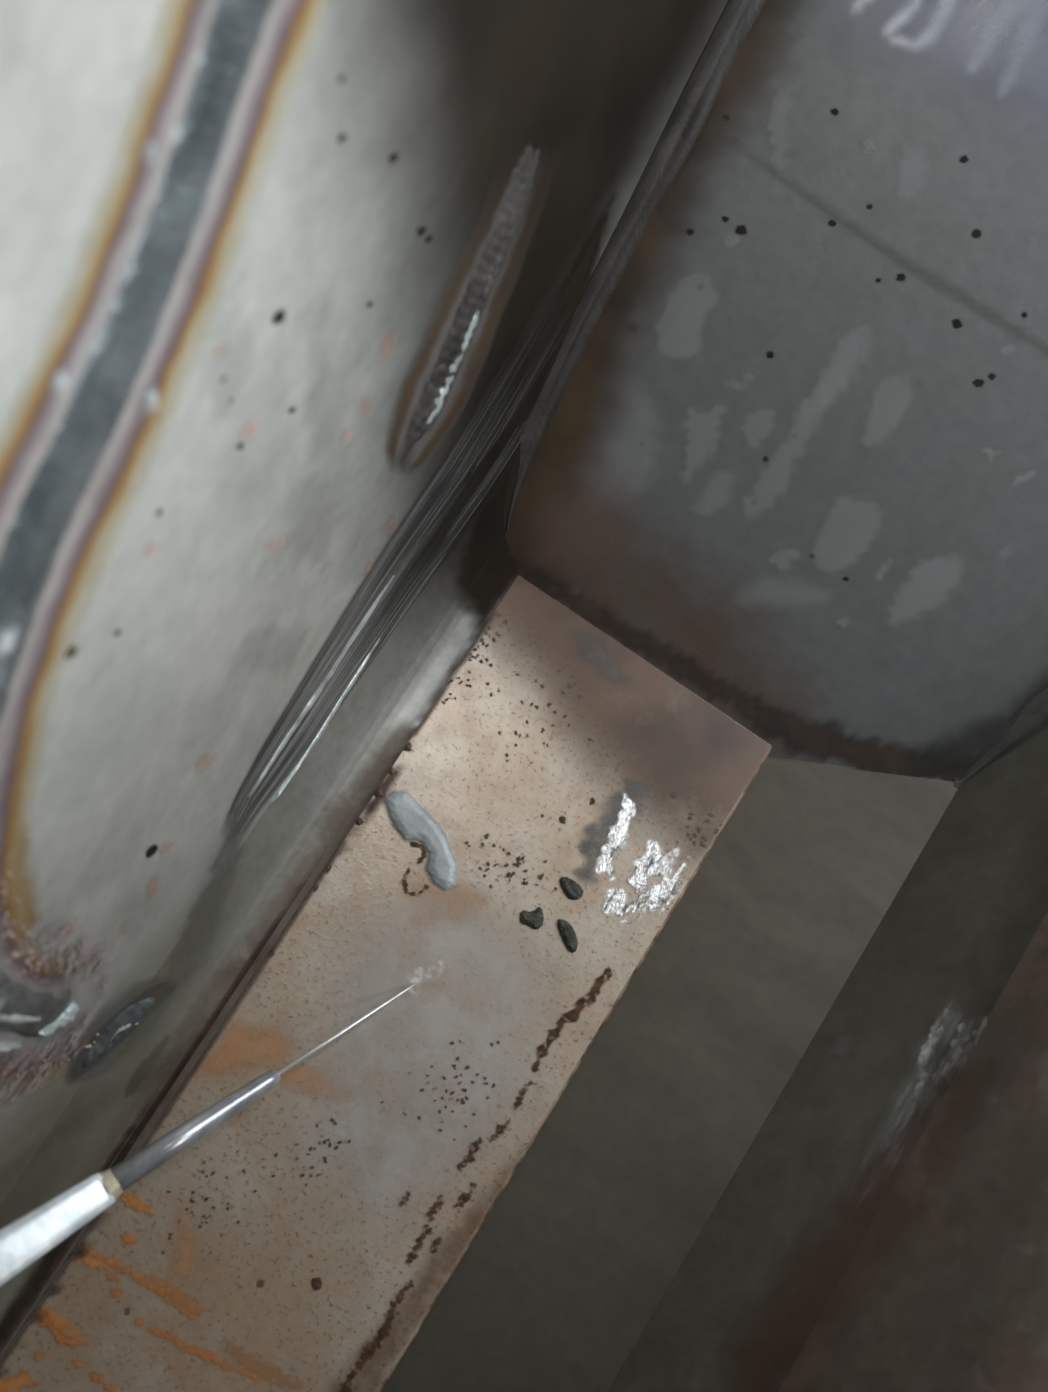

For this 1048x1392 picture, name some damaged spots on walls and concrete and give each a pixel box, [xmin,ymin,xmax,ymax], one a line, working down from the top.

damp [886,0,1048,93]
corrosion [85,729,408,1178]
damp [915,1017,987,1094]
corrosion [121,1191,154,1215]
corrosion [76,1245,204,1319]
corrosion [337,1210,483,1392]
corrosion [0,1354,41,1392]
corrosion [38,1307,115,1392]